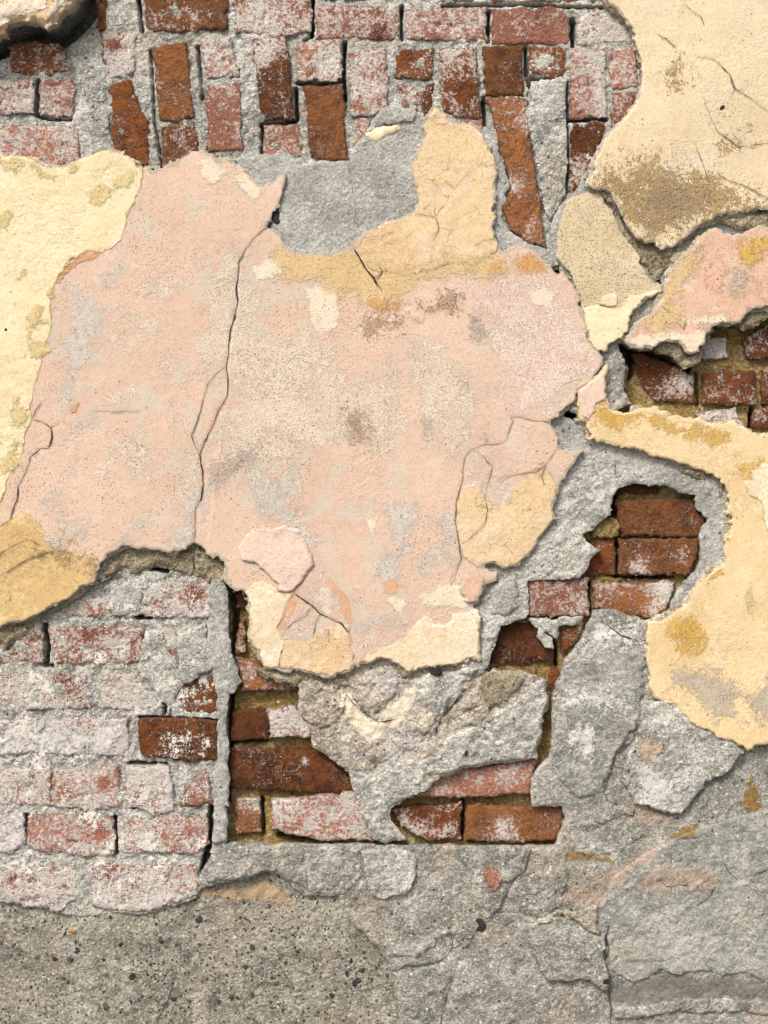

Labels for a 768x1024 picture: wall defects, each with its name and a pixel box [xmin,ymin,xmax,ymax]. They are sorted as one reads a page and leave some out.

crack [658,34,767,111]
crack [703,97,768,147]
crack [191,222,272,511]
spalling [583,290,768,433]
crack [0,404,61,576]
spalling [0,0,641,916]
spalling [486,483,699,773]